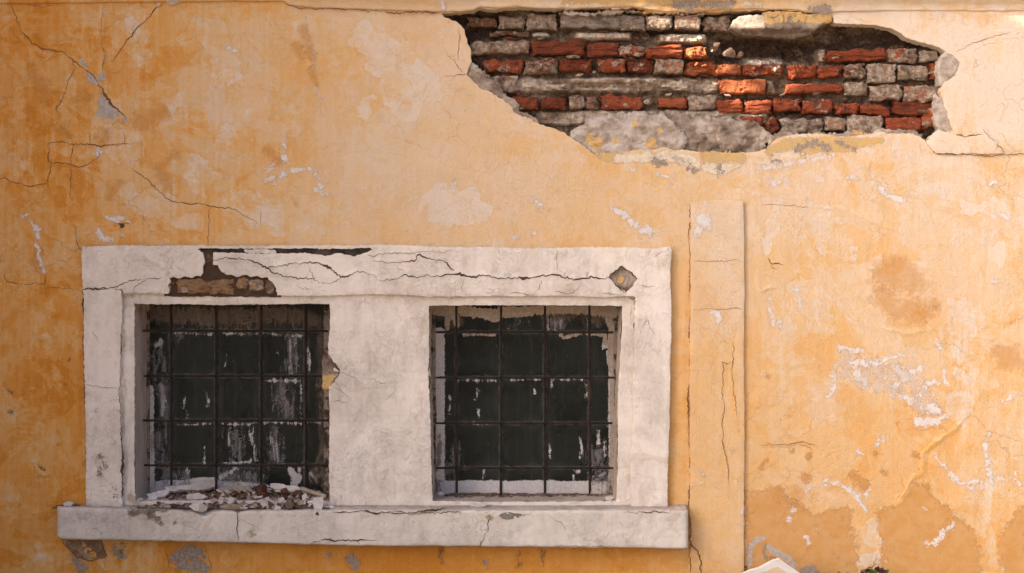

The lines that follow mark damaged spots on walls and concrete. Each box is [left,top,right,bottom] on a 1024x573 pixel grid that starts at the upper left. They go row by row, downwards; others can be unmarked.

crack [0,2,162,198]
peeling [79,54,128,122]
spalling [439,0,1003,154]
spalling [609,267,637,292]
spalling [322,355,339,389]
crack [135,171,740,573]
peeling [836,344,951,429]
spalling [64,539,129,573]